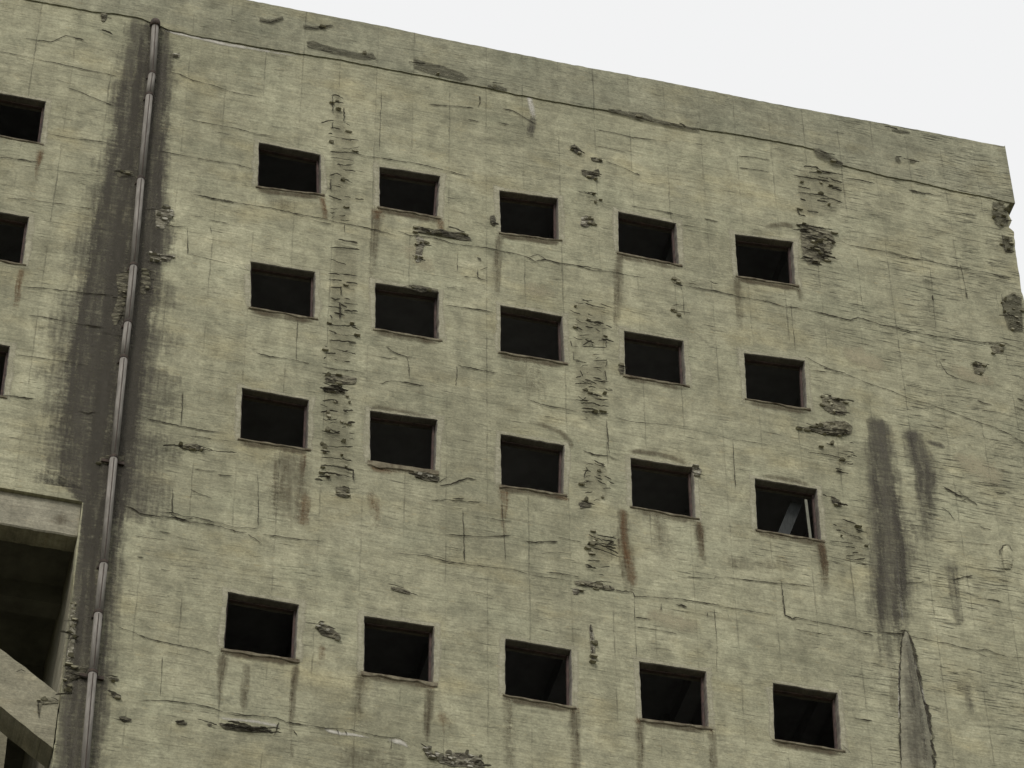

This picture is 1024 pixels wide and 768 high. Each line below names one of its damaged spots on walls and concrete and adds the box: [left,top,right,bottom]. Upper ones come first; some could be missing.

crack [429,96,535,124]
spalling [793,148,875,265]
spalling [992,201,1015,253]
water stain [47,20,283,768]
crack [121,469,318,571]
spalling [315,239,360,498]
spalling [570,299,629,414]
spalling [795,394,857,474]
water stain [868,419,910,626]
water stain [905,431,943,517]
spalling [999,292,1024,331]
spalling [175,719,282,734]